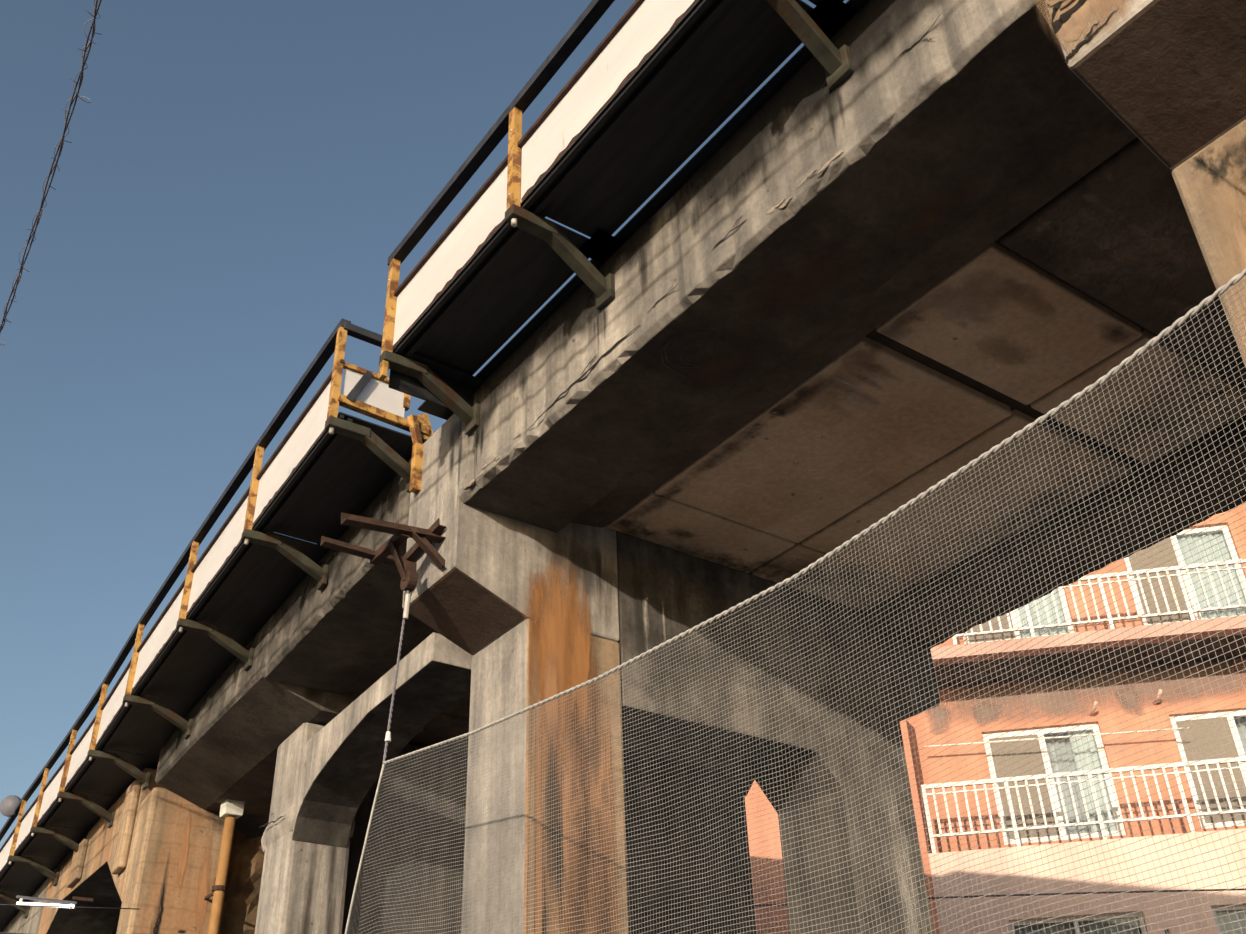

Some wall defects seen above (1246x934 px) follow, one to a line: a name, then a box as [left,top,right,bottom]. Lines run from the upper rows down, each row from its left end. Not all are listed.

crack [895,18,938,59]
spalling [1046,0,1124,53]
leakage [1197,138,1246,178]
rust [527,565,616,934]
crack [153,885,164,934]